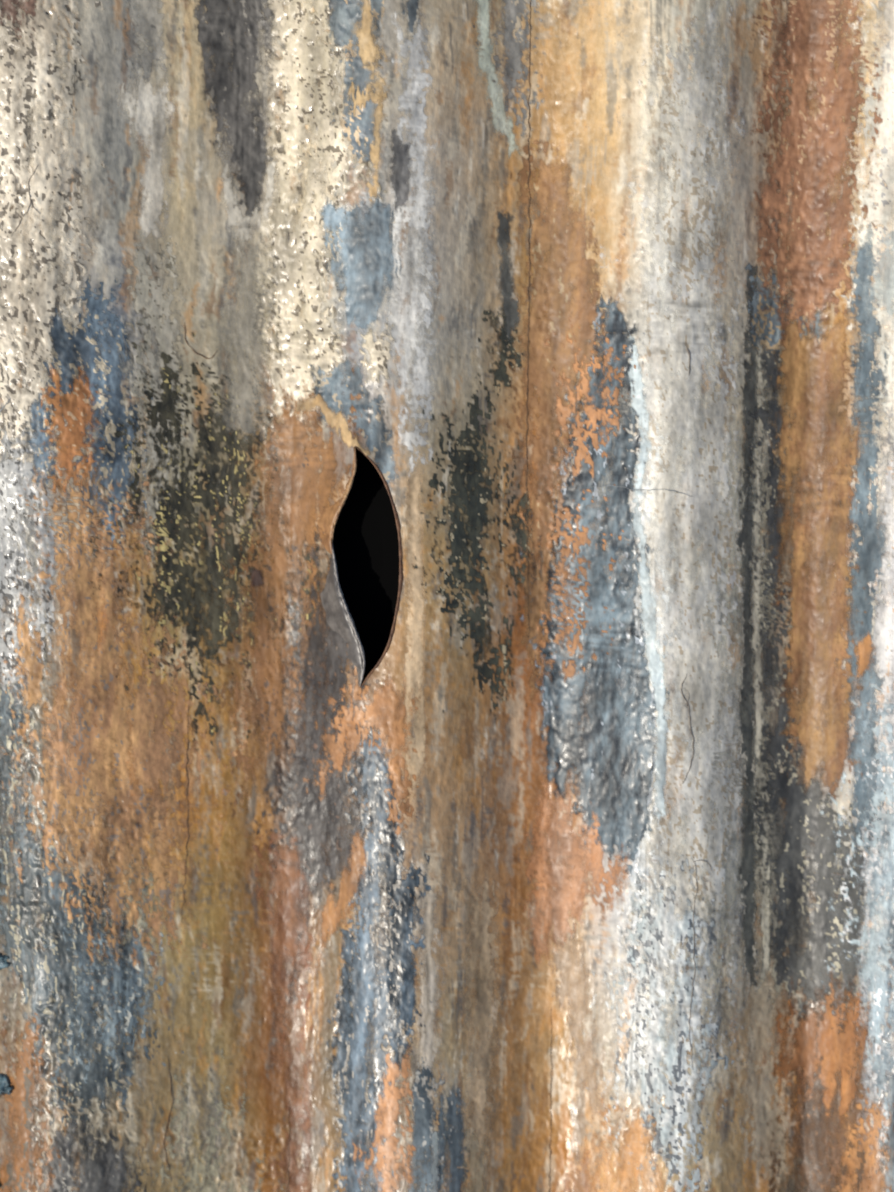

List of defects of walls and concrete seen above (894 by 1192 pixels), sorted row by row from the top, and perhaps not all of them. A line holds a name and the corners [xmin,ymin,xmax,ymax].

corrosion [505,140,636,700]
corrosion [753,0,883,799]
corrosion [2,367,369,977]
corrosion [524,784,627,962]
corrosion [0,1013,61,1192]
corrosion [563,1099,698,1192]
corrosion [769,976,892,1192]